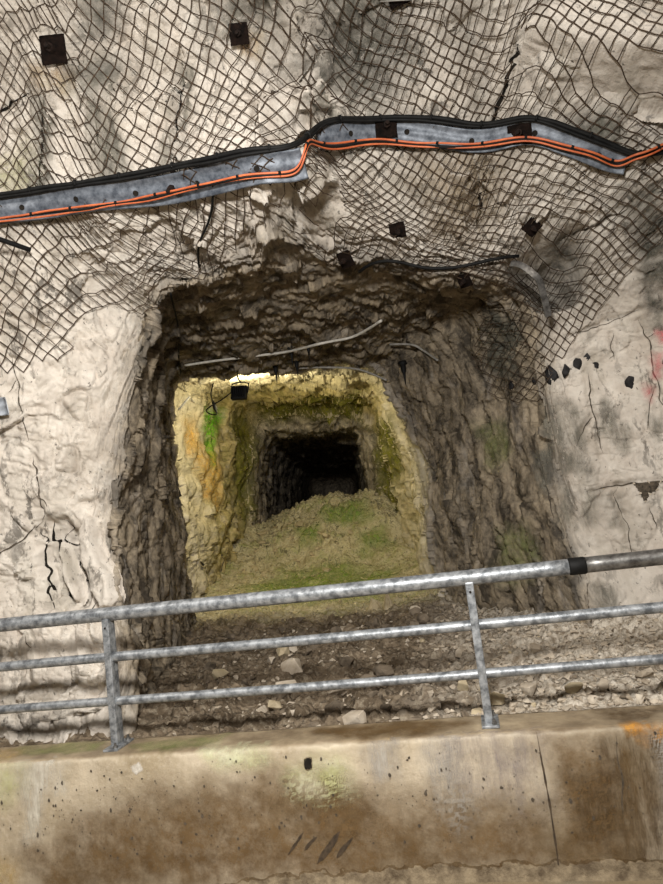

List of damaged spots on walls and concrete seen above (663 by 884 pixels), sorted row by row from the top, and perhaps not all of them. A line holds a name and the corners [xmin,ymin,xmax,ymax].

crack [581,375,602,450]
crack [568,310,663,429]
crack [0,359,89,608]
damp [33,782,545,884]
damp [556,735,663,865]